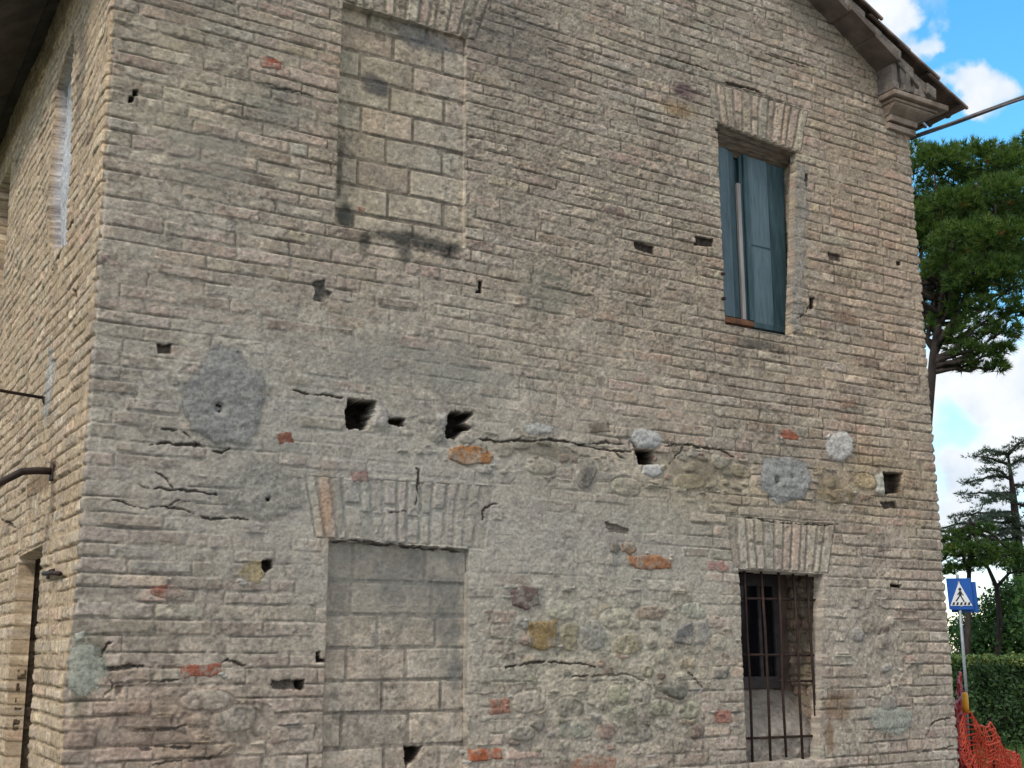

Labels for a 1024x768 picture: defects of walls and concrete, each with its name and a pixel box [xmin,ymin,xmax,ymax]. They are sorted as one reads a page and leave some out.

damp [338,194,352,226]
damp [362,231,460,257]
spalling [312,280,331,302]
spalling [344,401,372,431]
crack [151,428,229,454]
spalling [443,413,496,468]
crack [479,438,631,459]
crack [665,443,733,464]
crack [114,472,248,521]
crack [389,468,420,513]
crack [505,661,599,678]